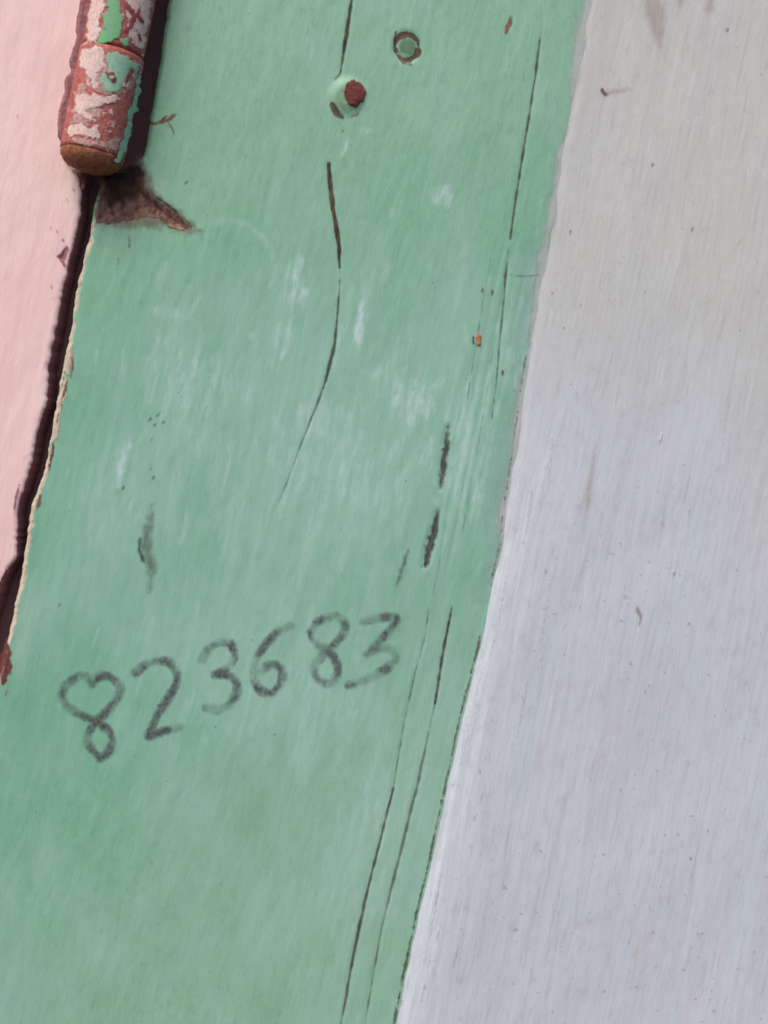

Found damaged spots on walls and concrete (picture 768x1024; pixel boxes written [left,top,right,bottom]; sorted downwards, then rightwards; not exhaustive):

crack [340,0,352,72]
crack [327,162,341,268]
crack [510,40,540,239]
crack [300,296,339,446]
crack [496,266,526,433]
crack [409,608,452,706]
crack [342,788,394,1015]
crack [394,636,480,1023]